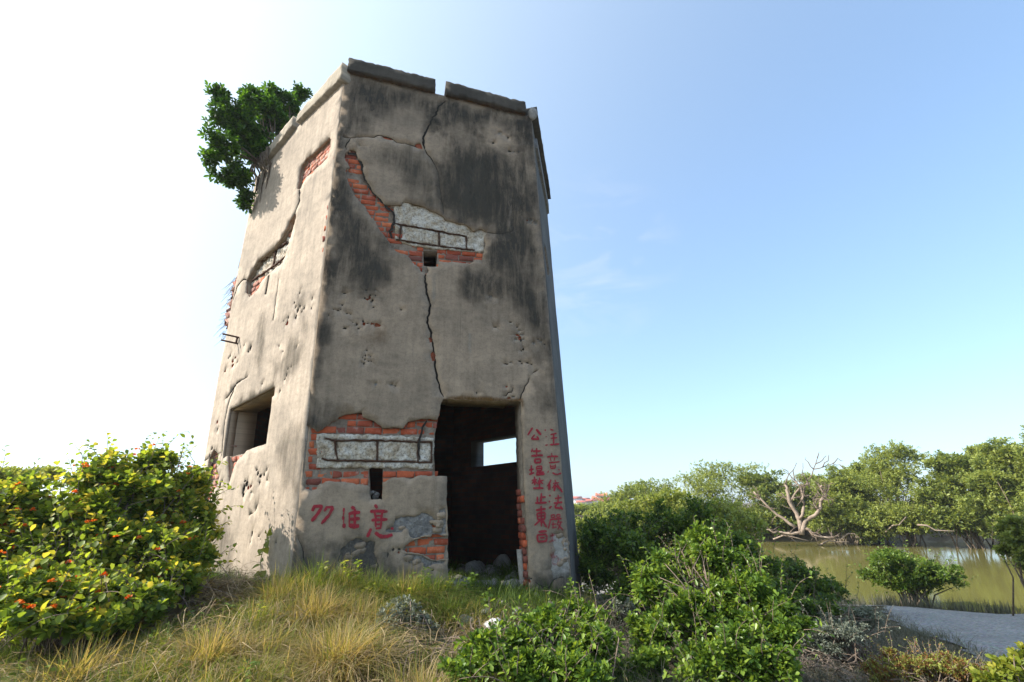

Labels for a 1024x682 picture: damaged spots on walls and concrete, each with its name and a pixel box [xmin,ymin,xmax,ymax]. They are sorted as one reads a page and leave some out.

flaking render [251,228,293,295]
flaking render [302,143,486,274]
crack [344,102,445,213]
leakage [323,79,551,356]
leakage [316,318,328,358]
crack [424,274,444,397]
flaking render [305,413,440,495]
peeling [338,508,448,578]
flaking render [516,489,539,595]